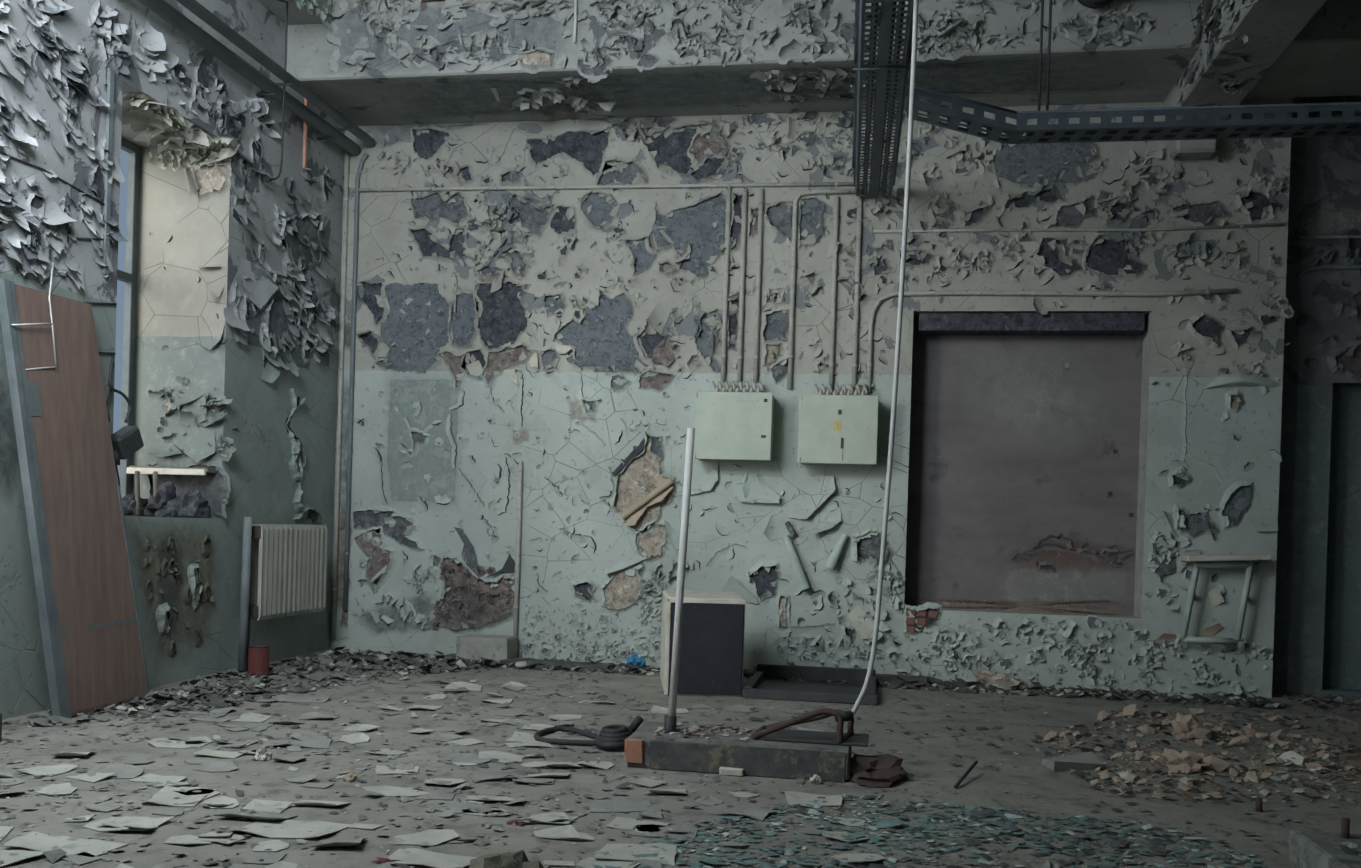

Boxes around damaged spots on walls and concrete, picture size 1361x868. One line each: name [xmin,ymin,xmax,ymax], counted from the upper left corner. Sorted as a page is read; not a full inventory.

peeling [351,0,1294,442]
crack [1005,256,1083,316]
crack [1086,145,1283,233]
peeling [375,416,542,458]
crack [353,133,1008,638]
spalling [349,430,688,664]
peeling [745,527,1273,695]
peeling [1144,467,1255,610]